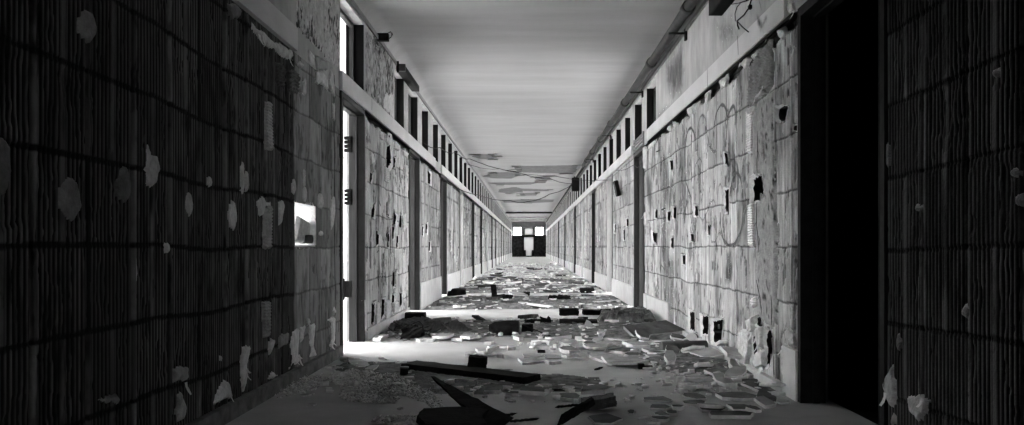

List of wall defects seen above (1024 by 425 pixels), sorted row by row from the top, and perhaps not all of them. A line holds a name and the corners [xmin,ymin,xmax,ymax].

spalling [746,87,766,158]
spalling [775,104,798,132]
spalling [367,131,407,249]
peeling [472,154,581,204]
spalling [651,206,695,267]
spalling [693,204,711,237]
spalling [747,173,765,248]
spalling [366,271,403,331]
spalling [735,297,781,374]